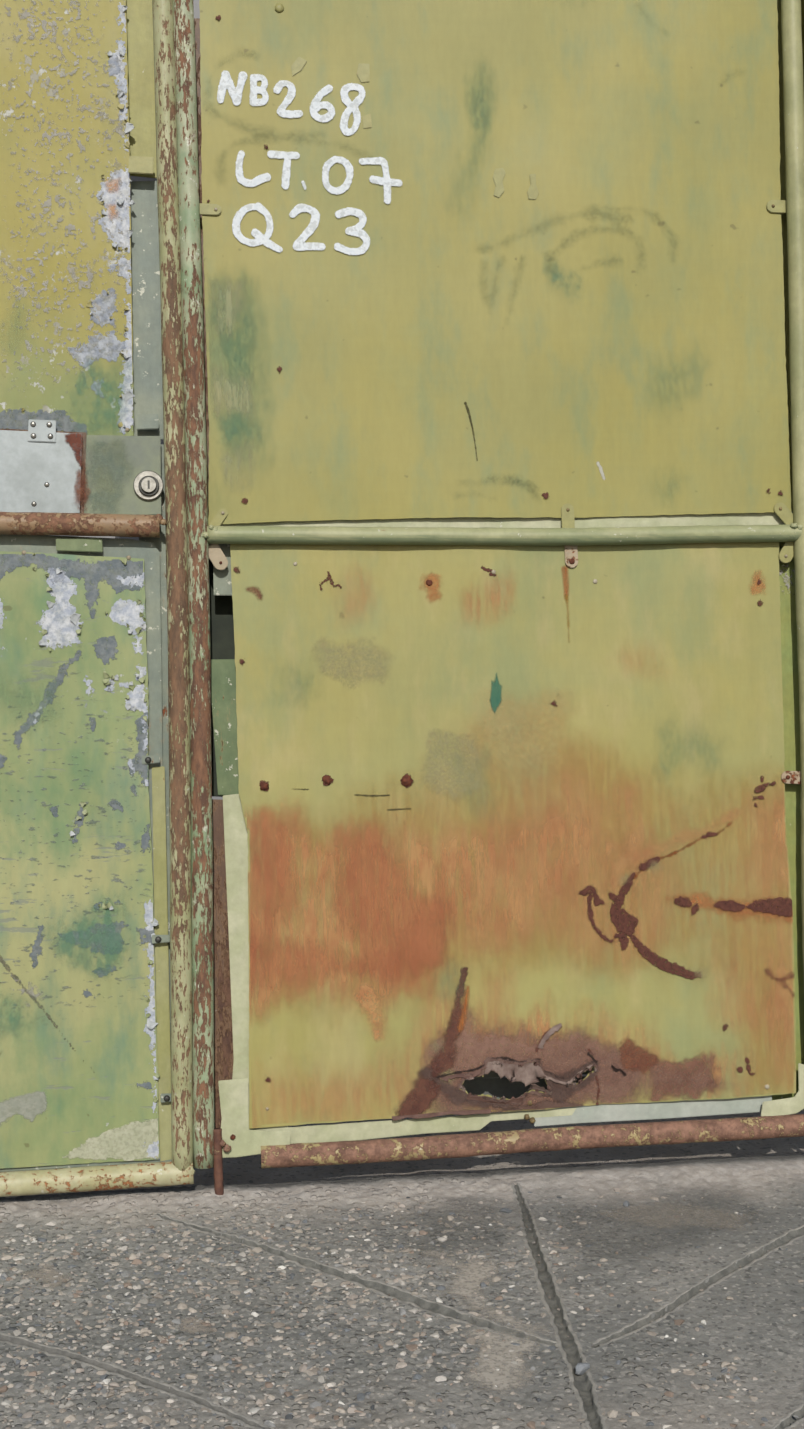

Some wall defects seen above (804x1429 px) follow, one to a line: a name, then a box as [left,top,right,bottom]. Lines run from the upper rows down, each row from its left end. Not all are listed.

peeling [0,0,135,435]
peeling [0,553,149,812]
peeling [50,802,88,844]
rust [400,773,414,788]
peeling [0,1091,47,1123]
peeling [29,895,160,1161]
rust [398,967,743,1116]